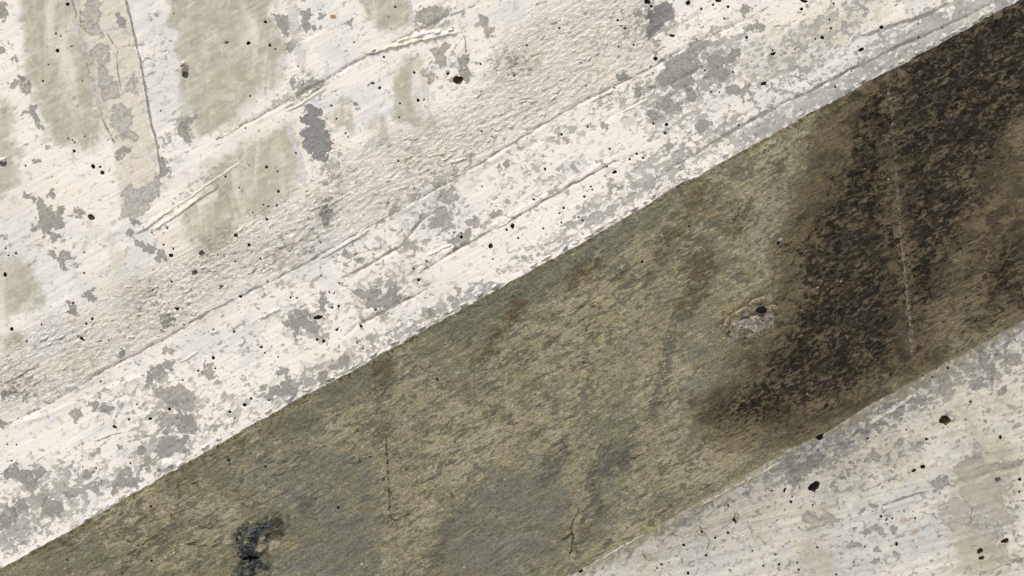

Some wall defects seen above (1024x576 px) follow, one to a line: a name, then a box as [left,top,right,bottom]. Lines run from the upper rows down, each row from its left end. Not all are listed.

peeling [630,1,675,40]
peeling [289,77,334,162]
peeling [634,38,752,120]
peeling [695,116,713,133]
peeling [22,188,86,271]
crack [10,5,768,423]
water stain [735,156,802,287]
water stain [895,173,916,369]
spalling [721,294,778,348]
peeling [82,346,197,495]
crack [354,428,409,527]
crack [561,507,579,557]